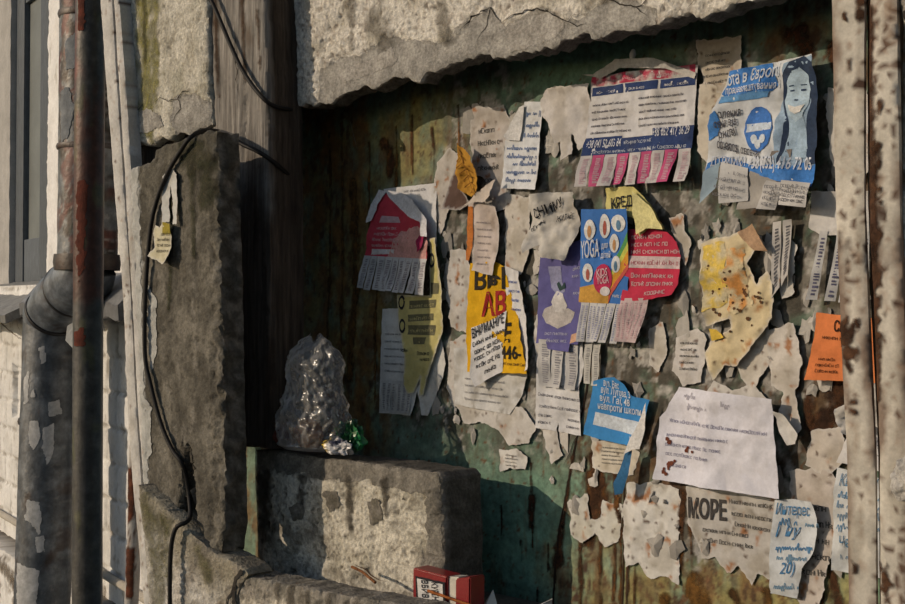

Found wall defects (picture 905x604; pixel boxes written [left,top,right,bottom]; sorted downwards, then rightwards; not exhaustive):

spalling [318,0,657,104]
crack [459,7,583,40]
crack [610,0,646,15]
peeling [60,87,74,142]
peeling [75,179,89,282]
corrosion [842,0,883,403]
corrosion [803,316,860,442]
water stain [256,470,273,544]
water stain [345,475,353,531]
water stain [380,477,388,517]
corrosion [547,451,636,604]
crack [226,569,243,604]